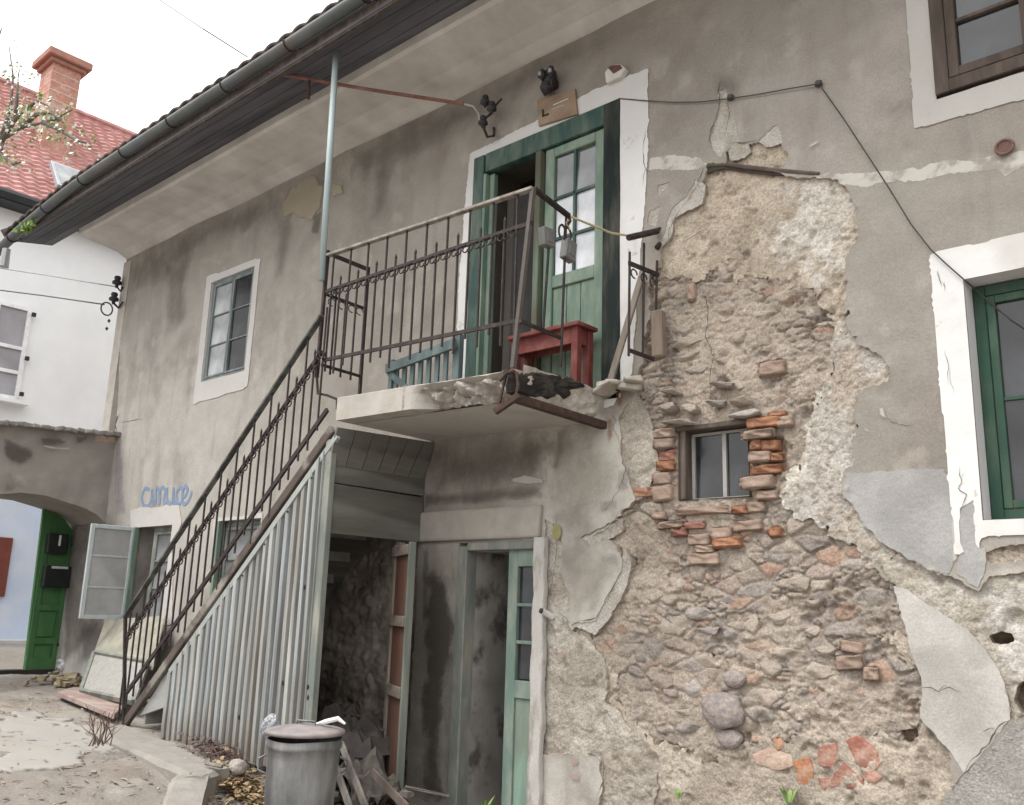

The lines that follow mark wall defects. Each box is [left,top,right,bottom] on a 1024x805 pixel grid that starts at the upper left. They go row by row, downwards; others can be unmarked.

peeling [283,153,354,232]
spalling [402,369,512,414]
spalling [523,365,608,421]
flaking render [543,89,955,805]
peeling [956,500,988,587]
water stain [423,554,454,798]